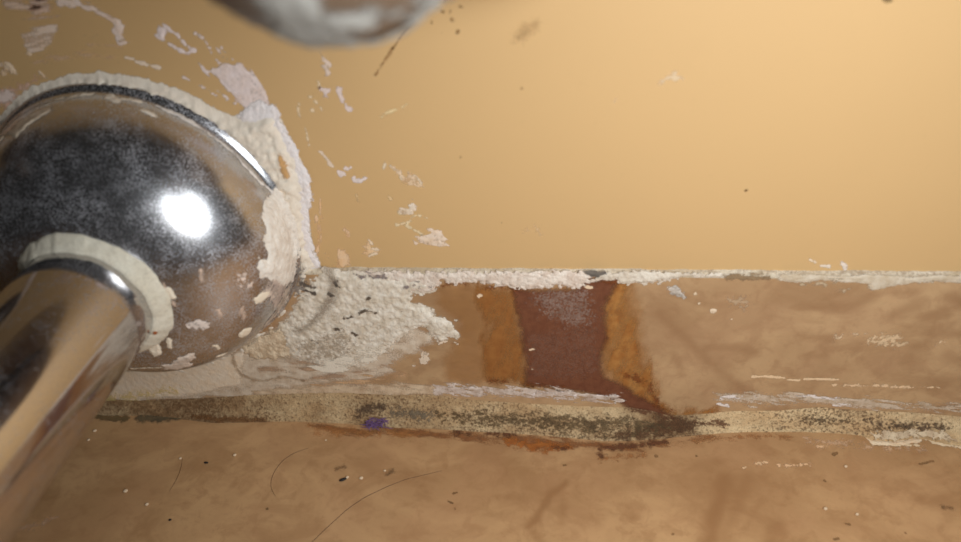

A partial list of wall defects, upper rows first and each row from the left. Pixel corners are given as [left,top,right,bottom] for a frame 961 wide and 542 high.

peeling [308,56,353,112]
peeling [279,156,290,179]
peeling [337,166,367,183]
peeling [356,269,723,296]
rust [462,278,718,416]
damp [258,361,405,386]
damp [95,414,265,423]
damp [354,403,730,441]
mould [802,414,958,442]